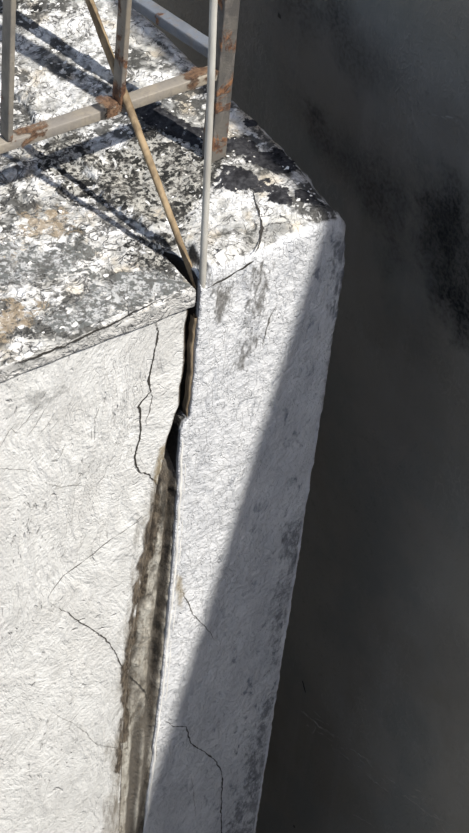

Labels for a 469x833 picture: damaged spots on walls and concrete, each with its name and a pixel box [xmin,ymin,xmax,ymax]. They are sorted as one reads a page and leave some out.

rust [13,120,48,148]
rust [95,95,123,119]
rust [182,66,219,89]
crack [208,190,264,288]
crack [48,517,148,700]
water stain [115,469,174,784]
crack [180,590,213,637]
crack [167,722,223,833]